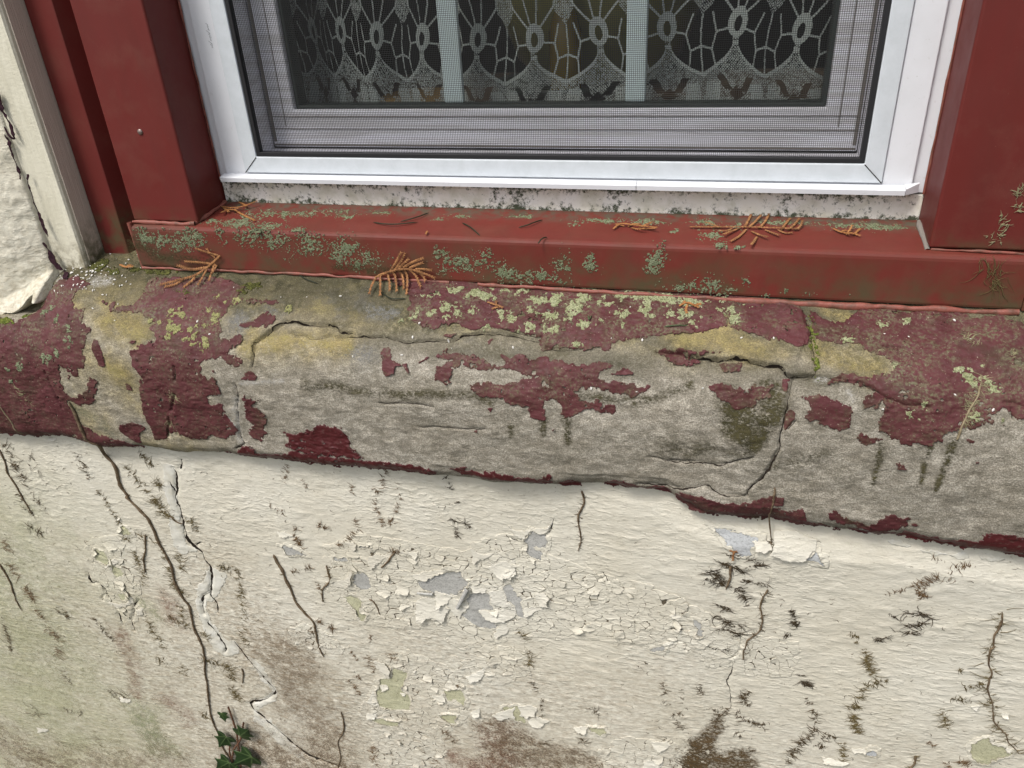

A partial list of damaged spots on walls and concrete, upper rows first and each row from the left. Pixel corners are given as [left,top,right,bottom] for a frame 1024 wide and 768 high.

crack [88,552,139,631]
peeling [0,275,437,475]
crack [170,459,338,766]
peeling [450,467,582,486]
peeling [276,522,801,768]
peeling [380,280,1024,447]
crack [643,324,832,497]
peeling [604,480,1024,569]